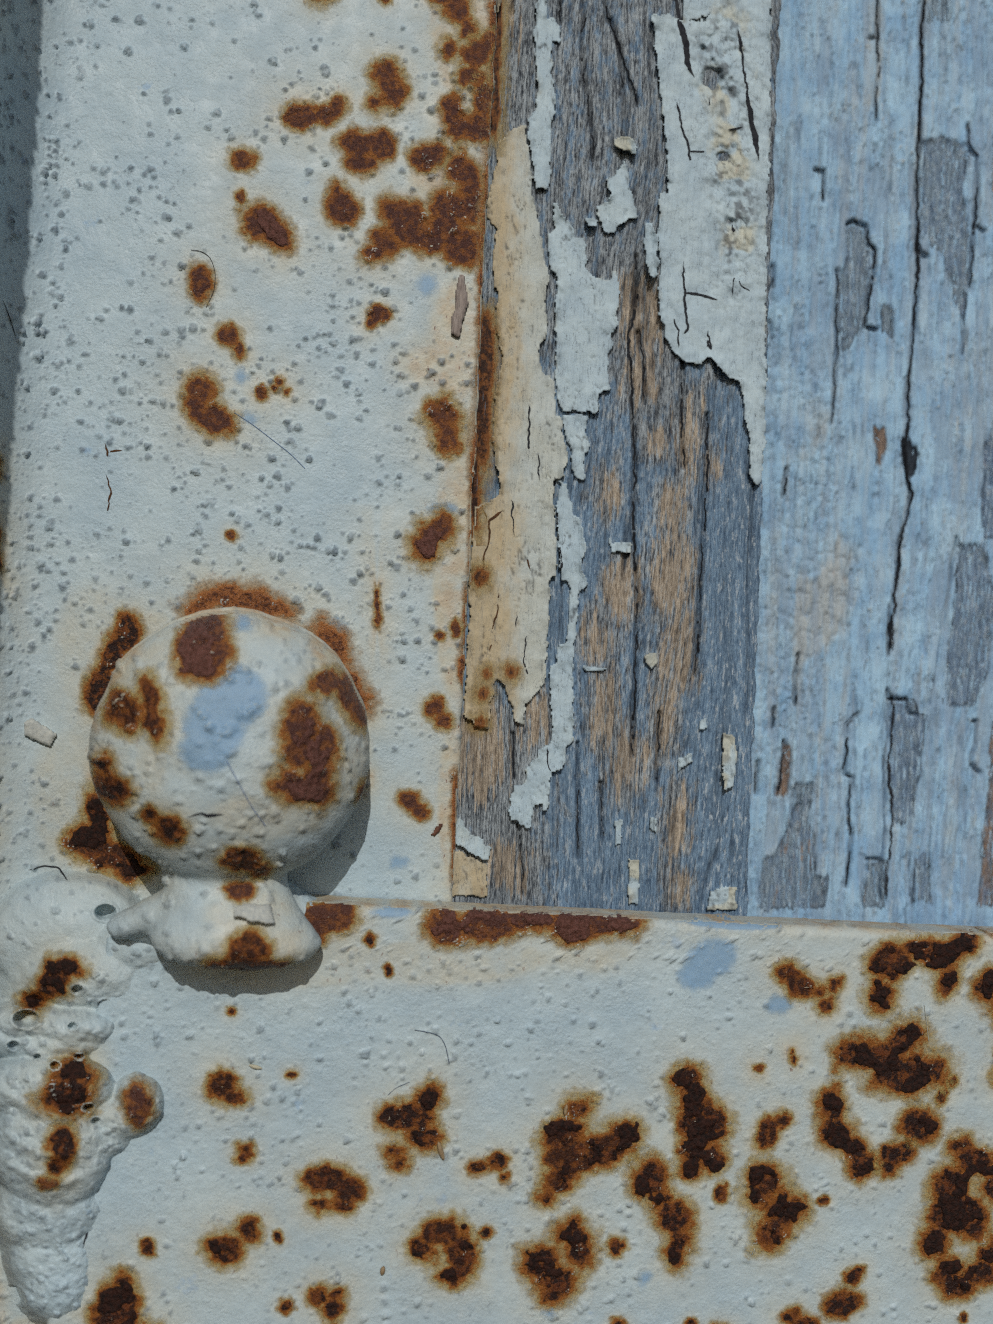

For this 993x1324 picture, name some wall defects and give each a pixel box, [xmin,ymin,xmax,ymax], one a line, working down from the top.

rust [280,0,523,732]
peeling [463,0,772,828]
crack [831,220,878,421]
crack [887,0,927,653]
crack [962,126,985,353]
rust [170,580,378,811]
peeling [452,817,492,898]
peeling [614,819,623,845]
peeling [627,858,640,904]
crack [842,665,948,899]
rust [514,1058,830,1309]
rust [812,927,993,1324]